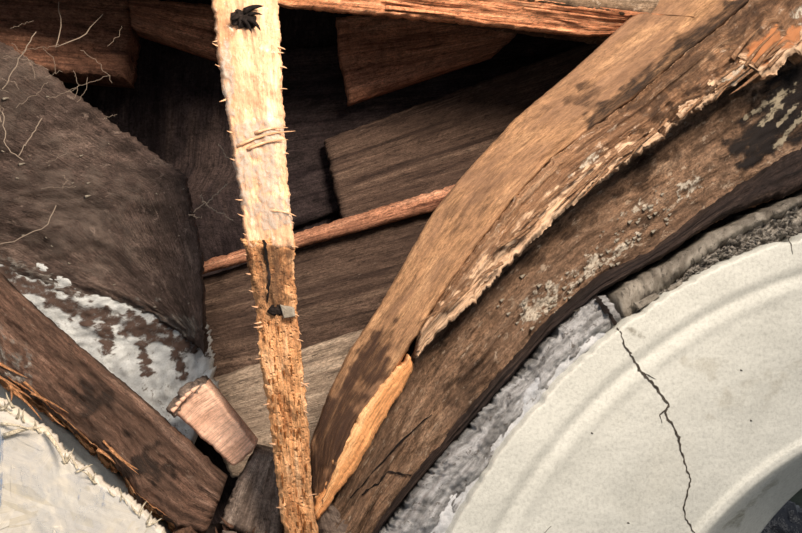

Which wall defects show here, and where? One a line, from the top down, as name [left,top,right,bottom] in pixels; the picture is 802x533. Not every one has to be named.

crack [574,296,695,533]